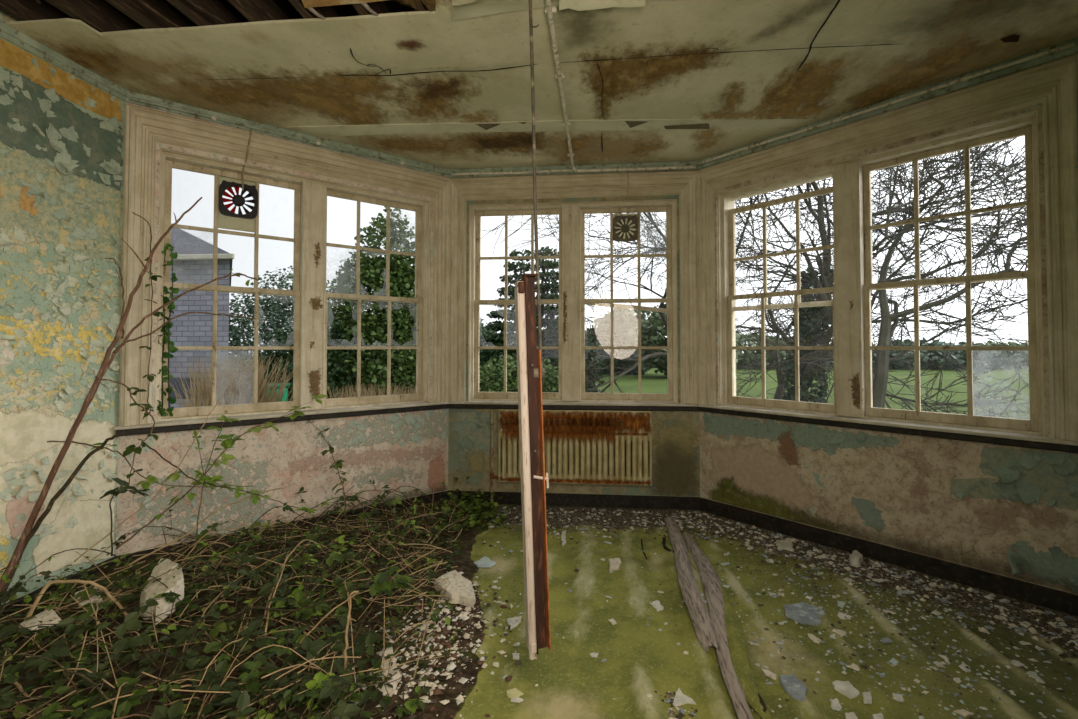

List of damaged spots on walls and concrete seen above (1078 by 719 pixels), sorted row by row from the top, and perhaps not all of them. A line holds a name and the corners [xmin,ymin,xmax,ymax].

water stain [58,45,663,163]
crack [338,0,894,153]
water stain [584,46,719,120]
water stain [696,58,843,150]
water stain [846,29,1049,110]
spalling [1000,34,1020,42]
peeling [0,38,124,579]
corrosion [499,410,519,440]
corrosion [543,411,651,443]
peeling [951,447,1078,510]
peeling [1005,541,1078,594]